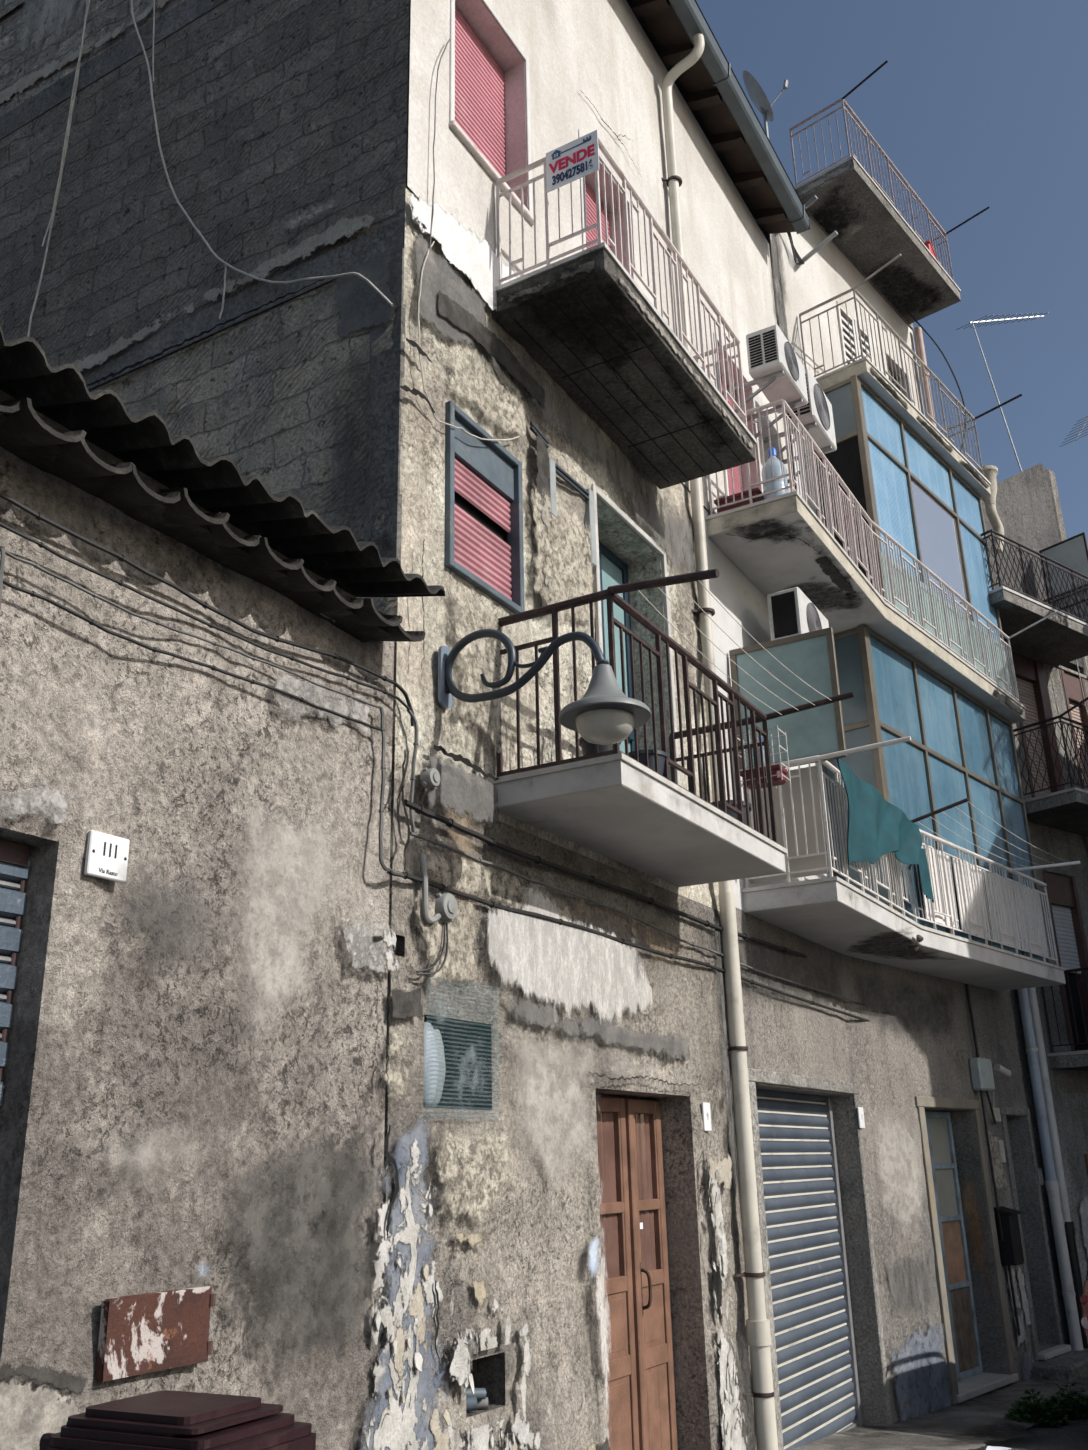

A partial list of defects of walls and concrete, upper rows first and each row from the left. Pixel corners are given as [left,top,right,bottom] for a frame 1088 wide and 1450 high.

water stain [812,187,858,240]
water stain [871,264,941,315]
water stain [234,1129,380,1364]
peeling [361,1119,541,1450]
peeling [705,1154,748,1450]